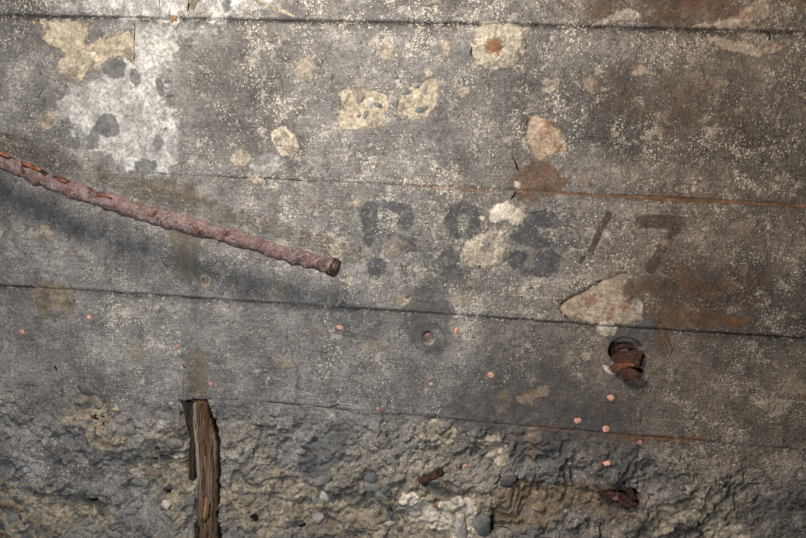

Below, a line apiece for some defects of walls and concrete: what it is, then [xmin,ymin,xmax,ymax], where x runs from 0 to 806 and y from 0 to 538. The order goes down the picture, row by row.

peeling [71,114,120,149]
peeling [135,127,167,176]
corrosion [511,161,806,208]
corrosion [0,150,341,277]
crack [491,504,512,530]